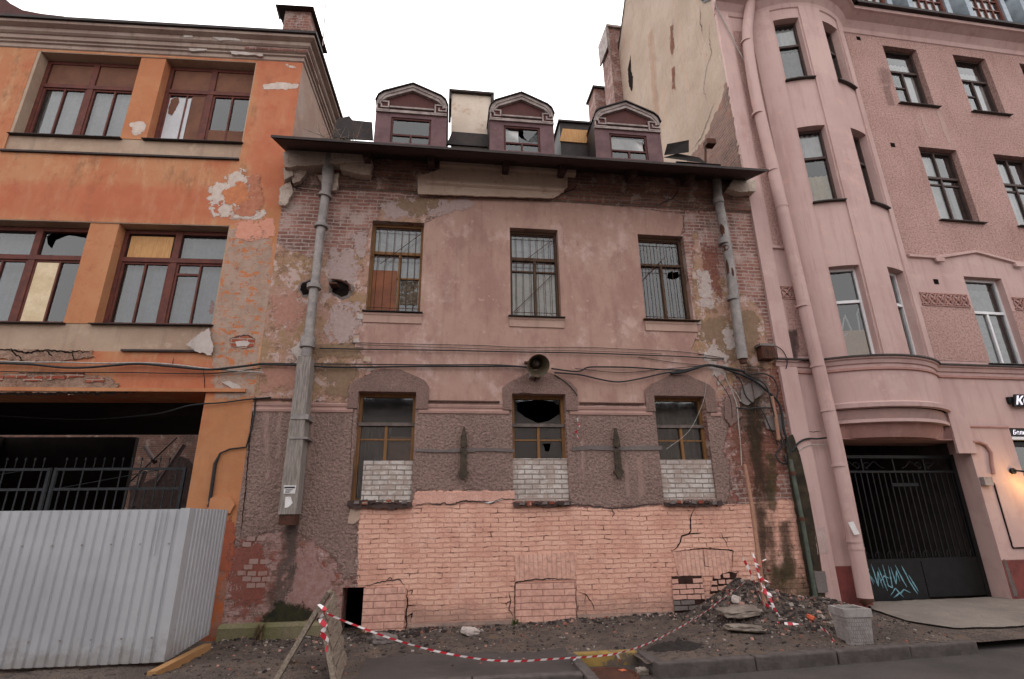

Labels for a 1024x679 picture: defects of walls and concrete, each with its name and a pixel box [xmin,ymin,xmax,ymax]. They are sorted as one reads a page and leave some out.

peeling [205,168,277,241]
flaking render [229,334,255,349]
peeling [272,278,311,331]
peeling [315,230,374,400]
peeling [695,243,760,385]
water stain [740,394,793,591]
peeling [219,516,339,619]
crack [405,590,414,630]
crack [506,578,559,616]
crack [671,508,734,573]